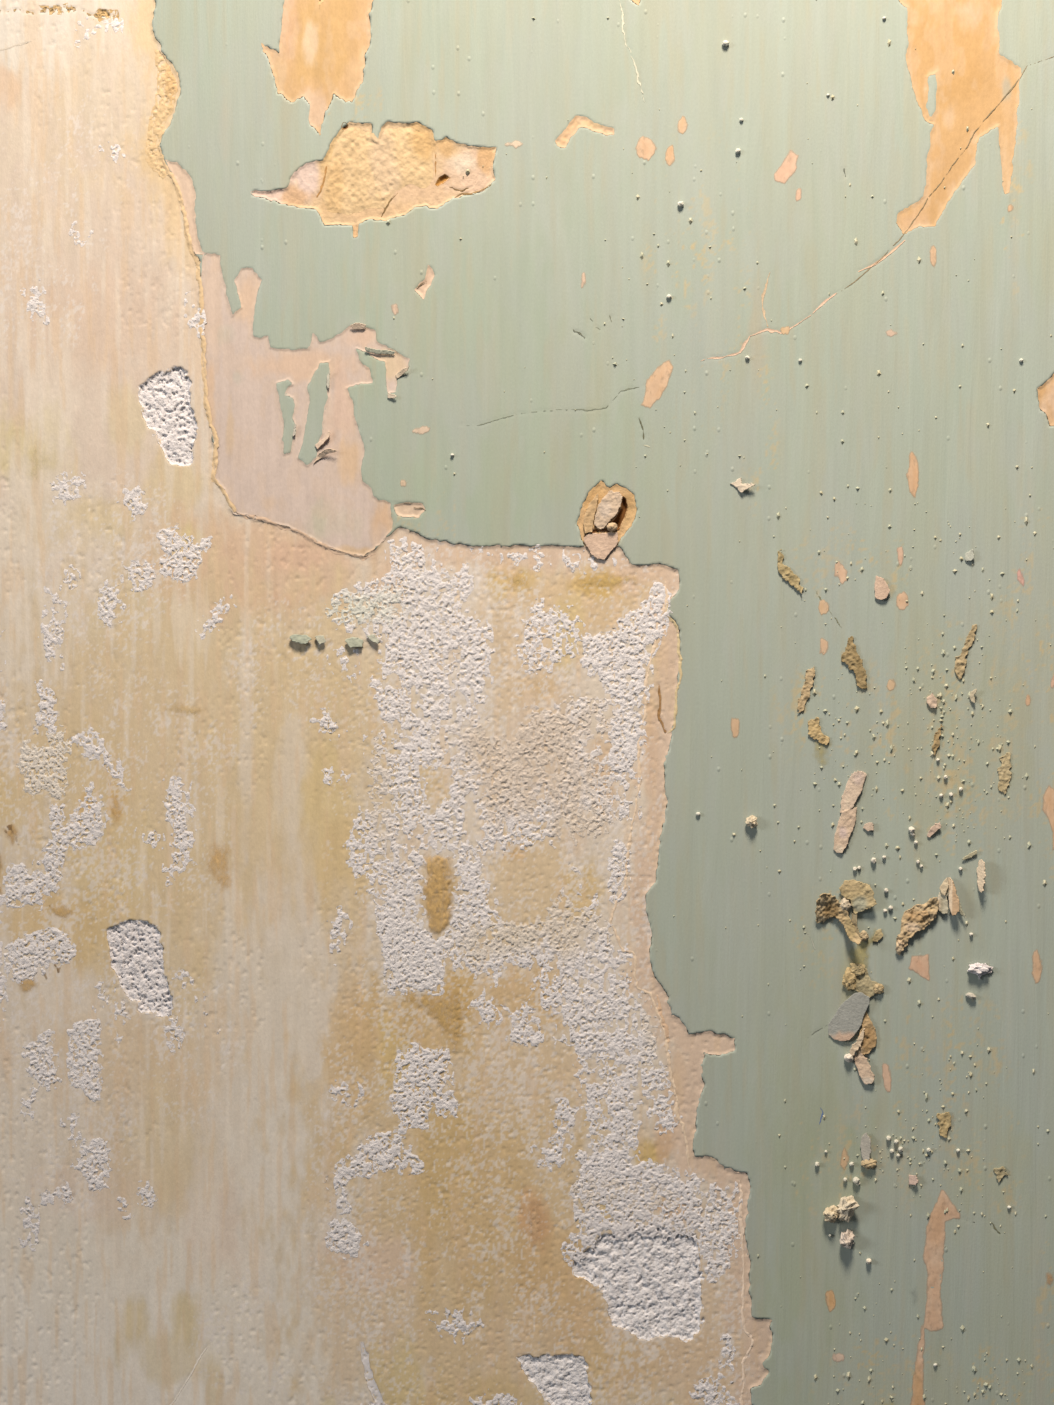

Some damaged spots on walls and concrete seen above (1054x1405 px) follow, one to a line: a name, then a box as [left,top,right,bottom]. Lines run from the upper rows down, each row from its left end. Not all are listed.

peeling [251,0,522,238]
crack [701,56,1054,361]
peeling [896,0,1022,234]
flaking render [97,524,213,627]
flaking render [0,926,77,1028]
flaking render [0,679,132,924]
flaking render [20,920,220,1122]
water stain [424,857,451,932]
flaking render [135,160,743,1345]
flaking render [19,1112,158,1251]
flaking render [516,1354,592,1405]
flaking render [689,1333,740,1405]